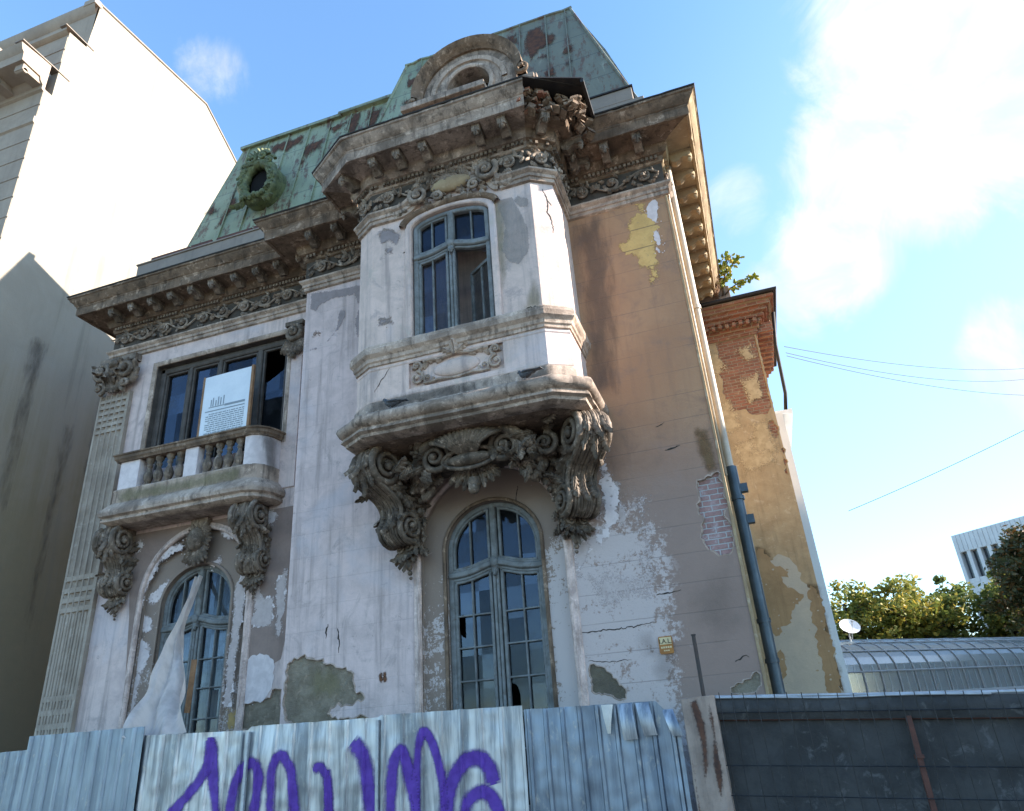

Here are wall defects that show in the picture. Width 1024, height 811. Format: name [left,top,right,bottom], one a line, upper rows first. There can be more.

corrosion [508,26,554,60]
peeling [619,200,665,284]
spalling [710,335,789,475]
peeling [572,446,629,578]
spalling [696,471,735,556]
peeling [125,525,191,712]
spalling [222,506,368,730]
spalling [588,663,627,701]
crack [582,622,652,633]
peeling [755,547,845,694]
corrosion [691,700,723,811]